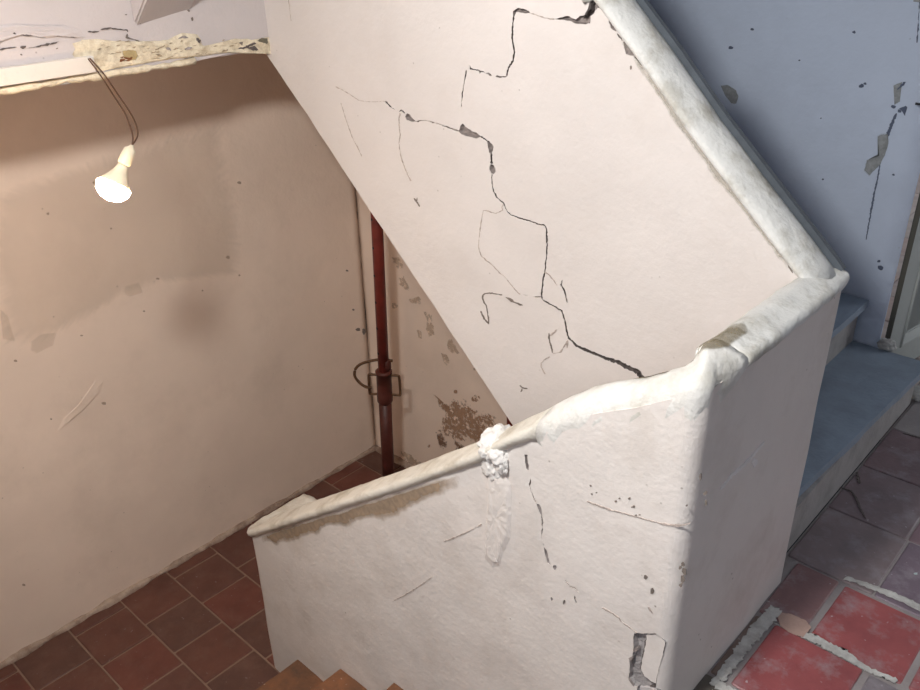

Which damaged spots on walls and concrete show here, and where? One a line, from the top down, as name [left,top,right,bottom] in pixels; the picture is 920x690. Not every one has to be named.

crack [0,42,57,50]
crack [88,27,140,42]
flaking render [0,33,271,95]
crack [912,0,920,42]
peeling [891,82,907,115]
crack [886,113,897,136]
peeling [865,134,888,174]
crack [336,0,644,378]
crack [866,163,881,239]
crack [587,485,691,527]
crack [525,455,579,605]
flaking render [629,633,666,690]